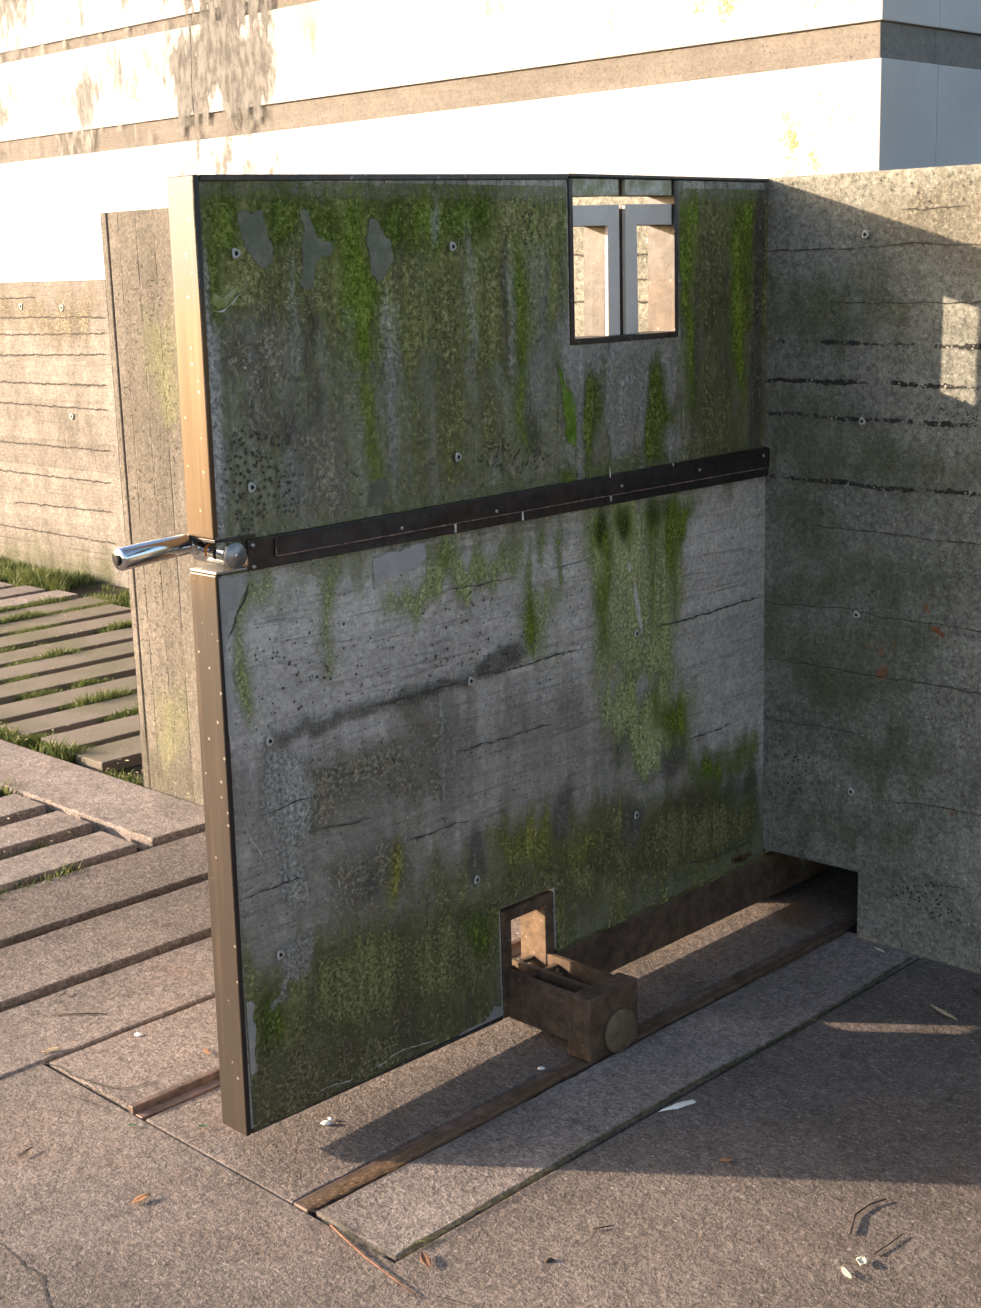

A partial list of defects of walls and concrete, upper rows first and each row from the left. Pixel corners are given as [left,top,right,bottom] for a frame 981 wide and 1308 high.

peeling [238,210,273,269]
peeling [299,209,333,290]
peeling [367,218,394,283]
water stain [647,498,695,576]
water stain [627,561,643,634]
water stain [272,642,525,830]
water stain [323,836,415,912]
water stain [251,992,494,1131]
crack [0,1243,51,1308]